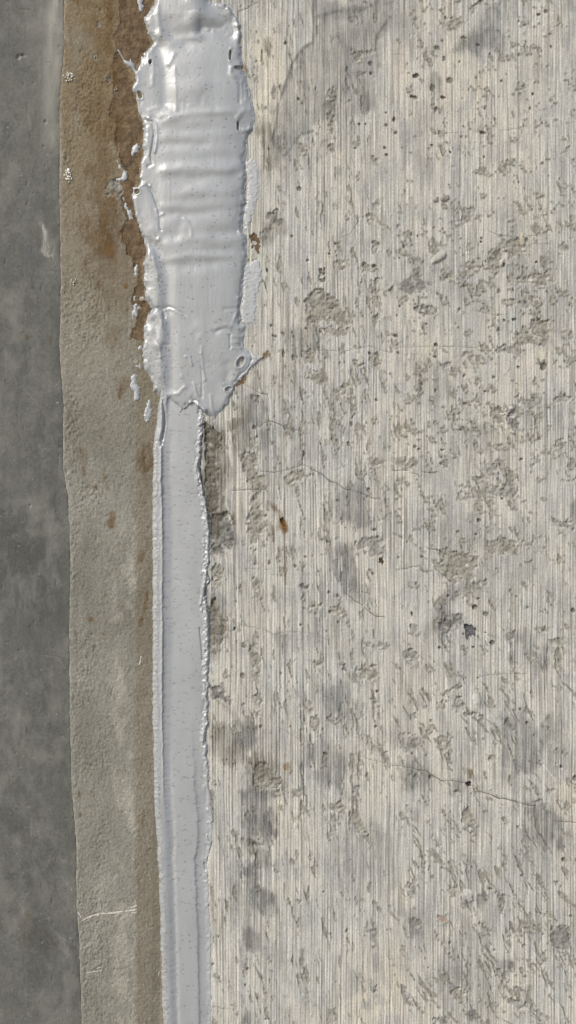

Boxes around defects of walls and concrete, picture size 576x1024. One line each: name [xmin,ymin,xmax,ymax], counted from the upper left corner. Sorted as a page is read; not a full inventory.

crack [232,386,403,538]
crack [350,734,576,823]